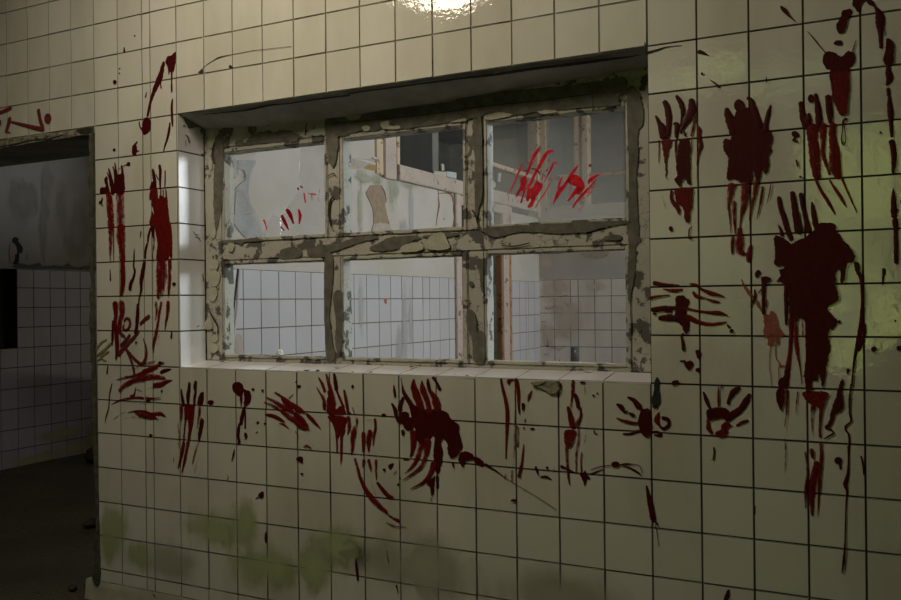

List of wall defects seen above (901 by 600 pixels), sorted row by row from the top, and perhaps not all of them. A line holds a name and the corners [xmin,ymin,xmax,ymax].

peeling [180,115,307,252]
peeling [324,76,644,304]
peeling [205,260,224,362]
peeling [280,185,459,371]
peeling [464,299,486,365]
spalling [571,347,579,362]
damp [335,407,634,600]